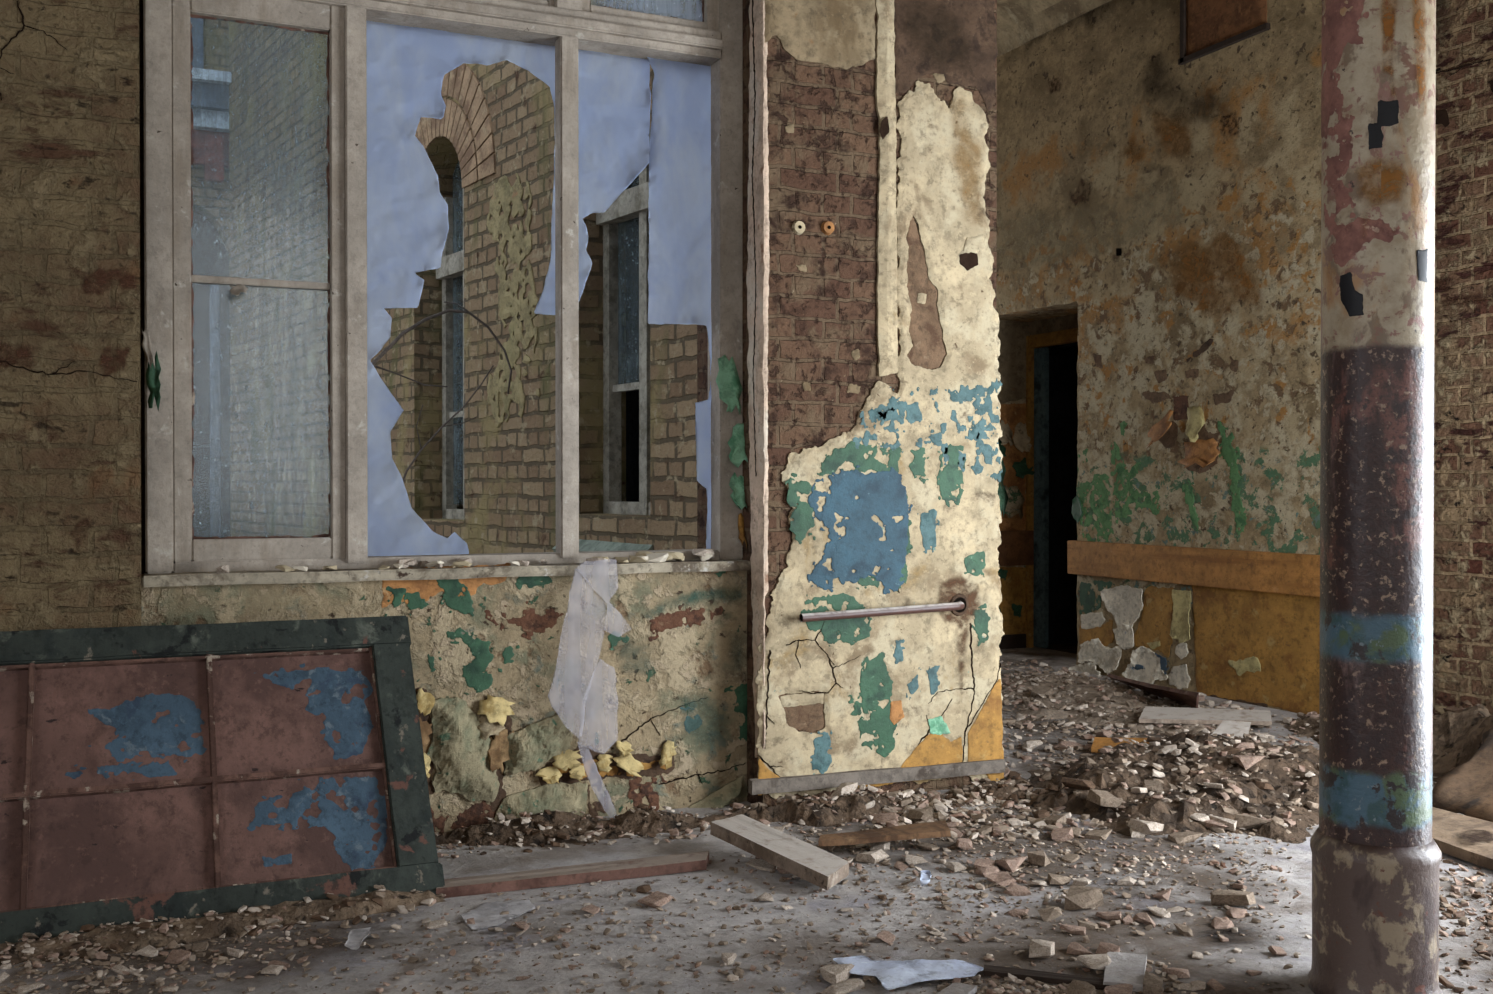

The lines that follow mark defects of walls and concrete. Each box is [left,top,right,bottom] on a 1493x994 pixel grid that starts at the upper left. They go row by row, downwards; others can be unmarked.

crack [0,0,67,100]
peeling [1321,0,1410,317]
peeling [1416,249,1486,305]
peeling [778,217,1035,798]
peeling [1076,339,1249,542]
peeling [381,563,564,834]
peeling [608,631,629,650]
spalling [649,603,723,642]
peeling [724,681,747,741]
crack [918,623,1001,762]
peeling [1068,580,1320,714]
spalling [535,744,675,818]